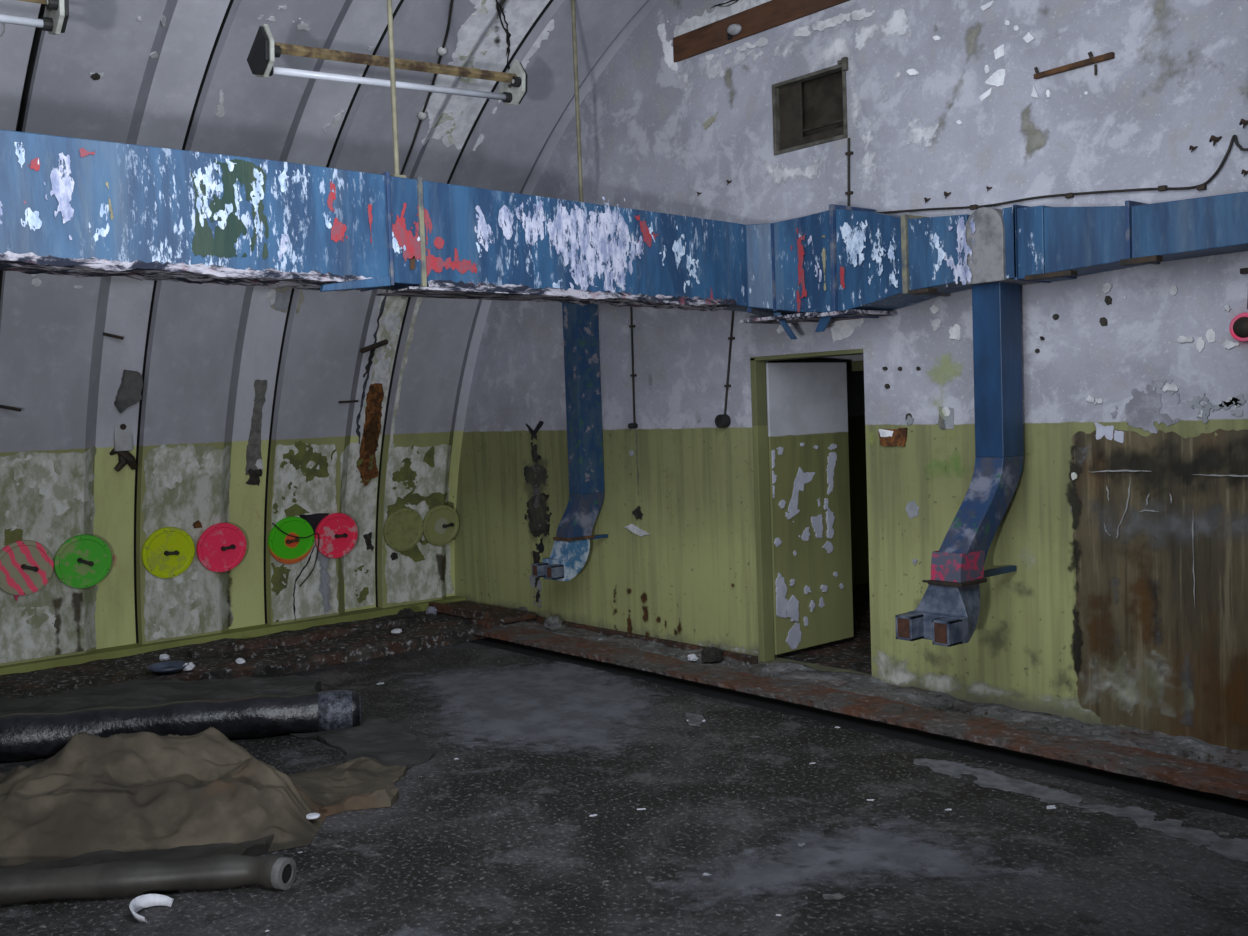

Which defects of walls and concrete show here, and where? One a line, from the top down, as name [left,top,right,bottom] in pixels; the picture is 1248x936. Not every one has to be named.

peeling [14,142,95,240]
peeling [89,182,114,242]
peeling [191,157,296,261]
peeling [323,181,348,243]
peeling [392,197,700,293]
peeling [925,217,976,285]
corrosion [356,383,384,486]
peeling [0,446,98,663]
peeling [384,444,455,604]